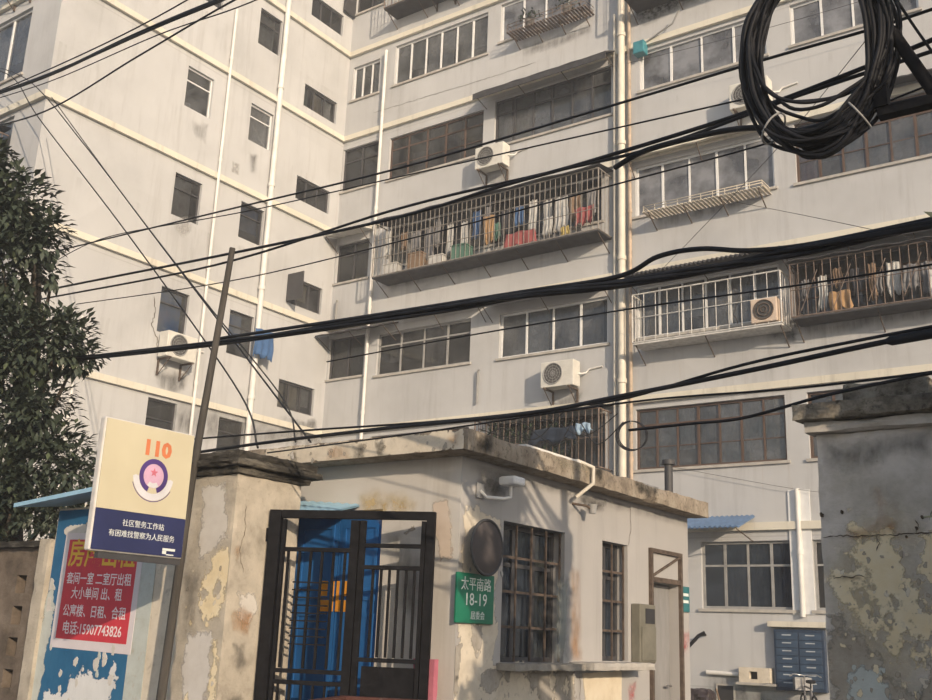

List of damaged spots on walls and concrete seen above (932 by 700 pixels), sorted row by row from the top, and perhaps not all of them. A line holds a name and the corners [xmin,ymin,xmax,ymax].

flaking render [432,499,502,574]
crack [823,520,932,551]
peeling [31,586,55,700]
peeling [73,644,115,686]
peeling [187,546,229,627]
flaking render [454,566,577,700]
peeling [827,510,932,700]